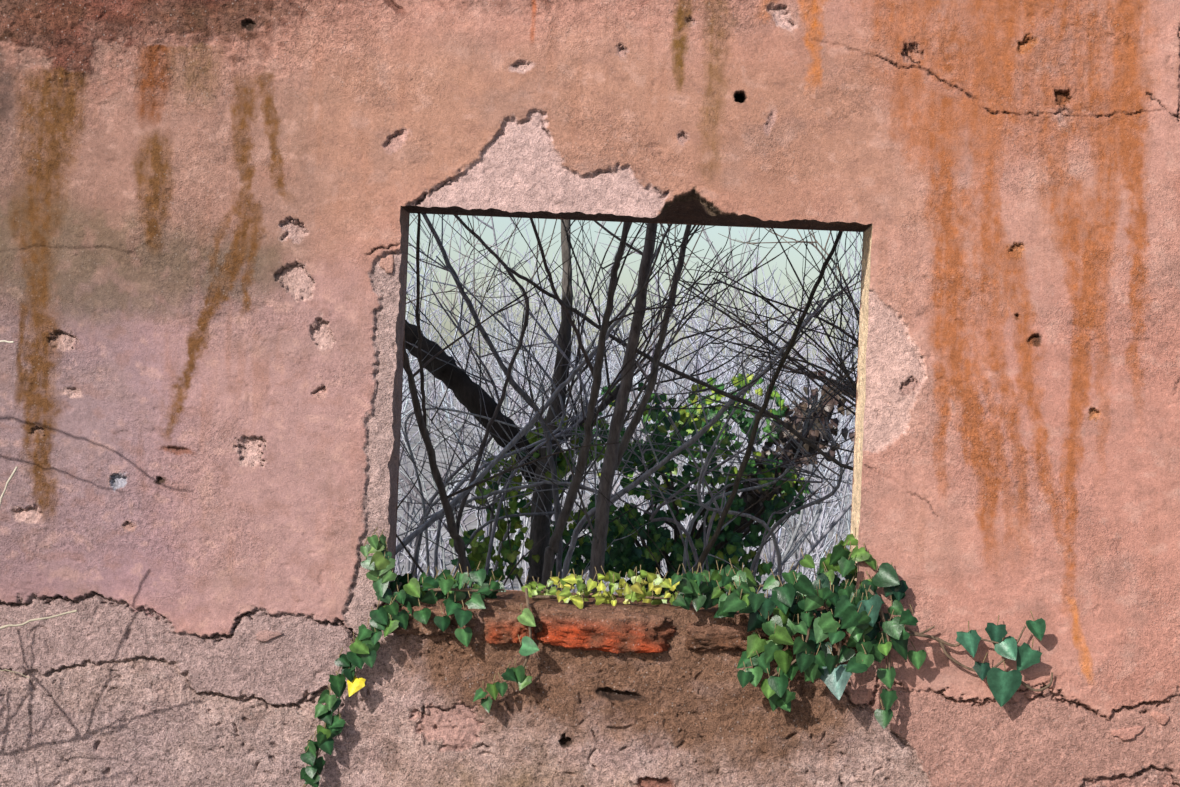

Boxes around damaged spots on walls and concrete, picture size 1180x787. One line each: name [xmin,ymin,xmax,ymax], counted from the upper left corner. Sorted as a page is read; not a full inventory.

leakage [666,0,744,196]
crack [812,22,1180,123]
spalling [405,107,740,218]
spalling [278,214,311,238]
leakage [0,40,311,534]
rust [750,0,1180,691]
spalling [0,247,1180,787]
crack [421,703,495,752]
crack [837,772,845,787]
crack [1015,672,1067,694]